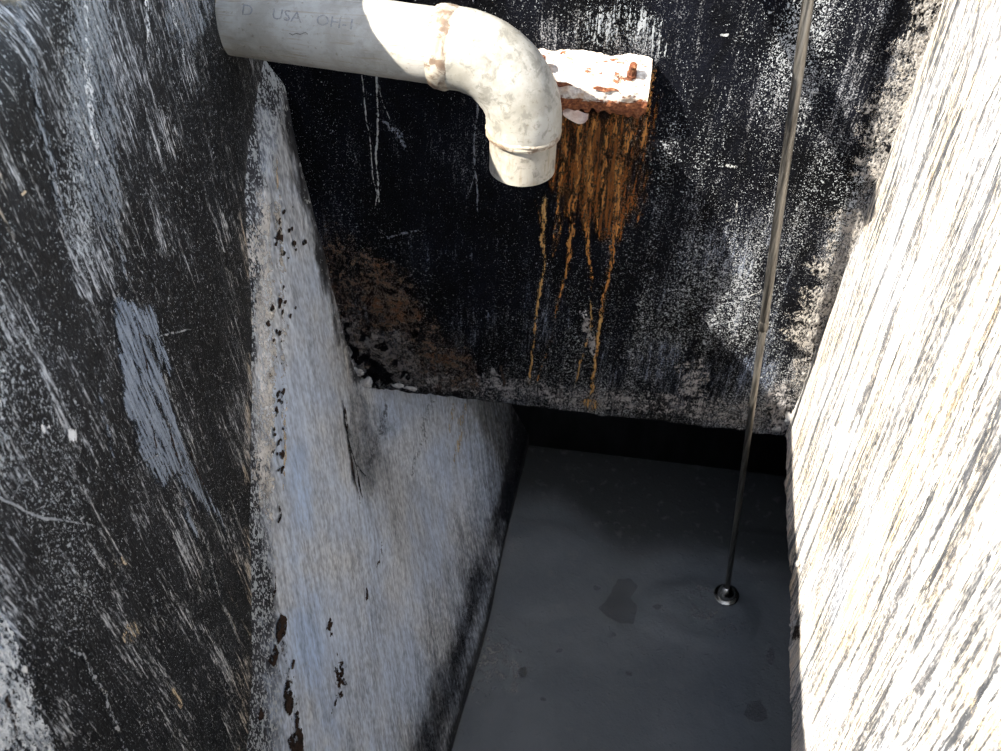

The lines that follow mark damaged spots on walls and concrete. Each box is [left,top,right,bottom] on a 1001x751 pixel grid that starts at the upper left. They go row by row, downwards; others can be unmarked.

damp [318,210,764,476]
corrosion [528,70,657,411]